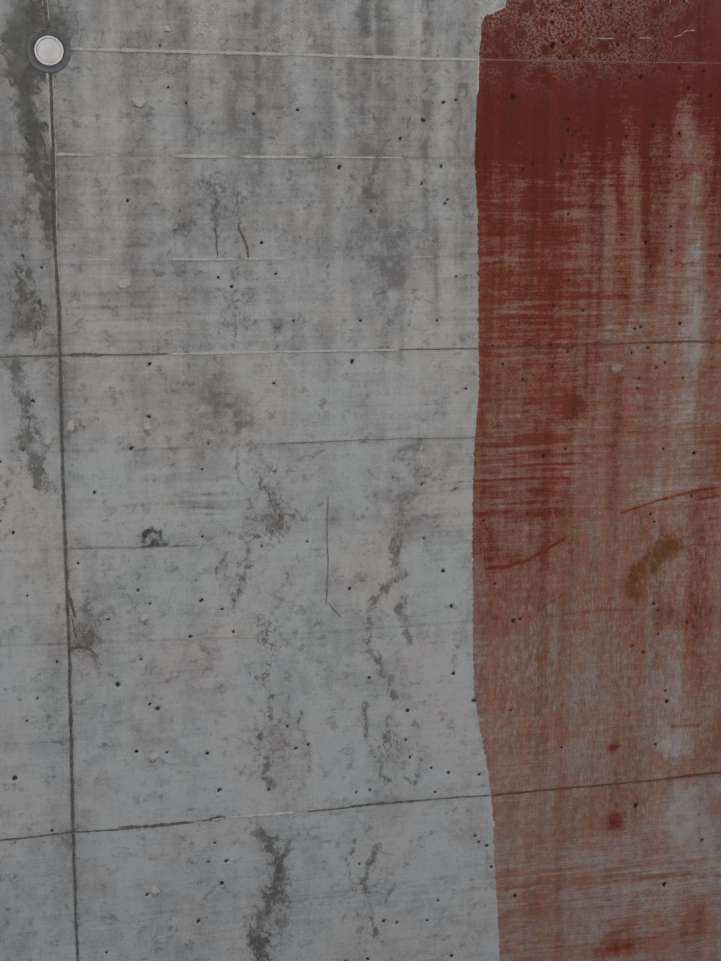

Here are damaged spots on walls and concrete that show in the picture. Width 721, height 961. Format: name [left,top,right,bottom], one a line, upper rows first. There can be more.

damp [2,0,64,249]
damp [9,263,45,347]
damp [18,396,50,490]